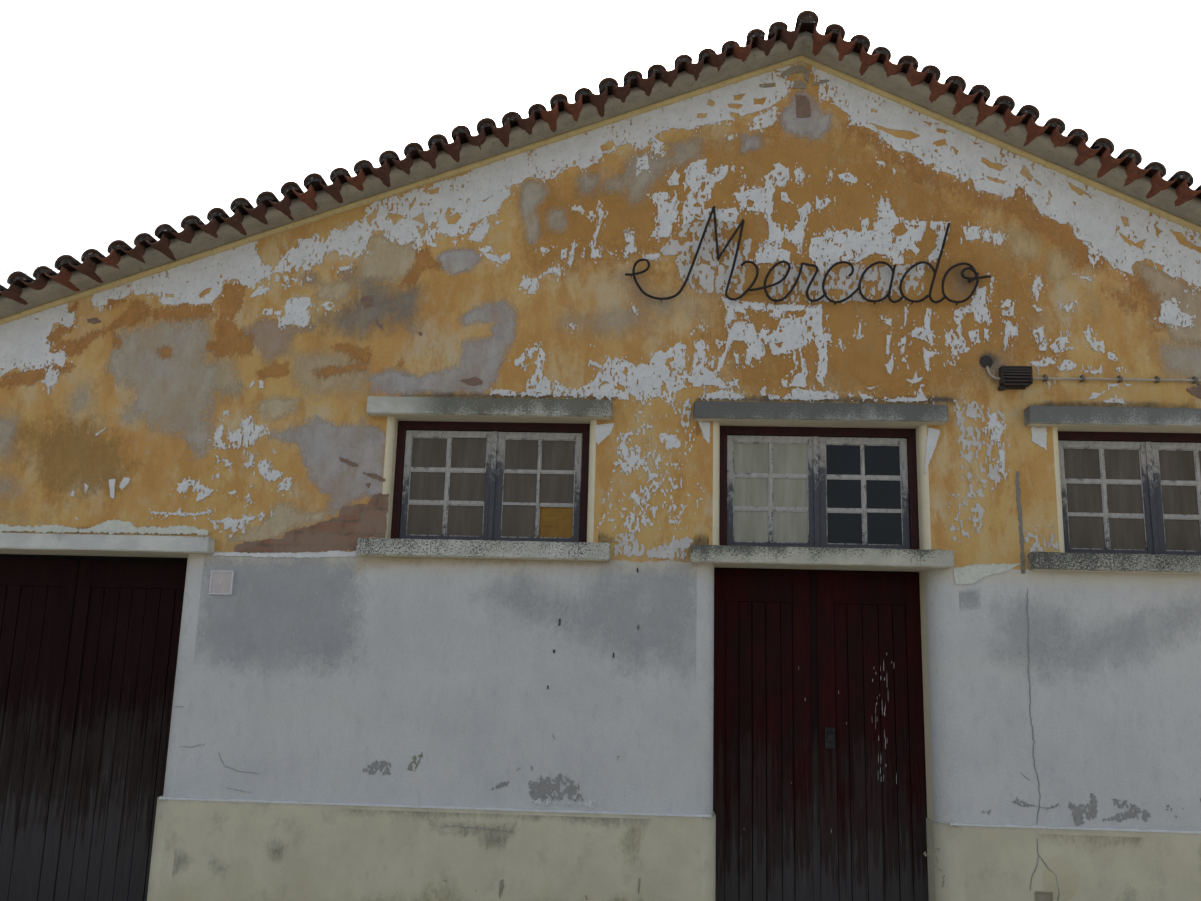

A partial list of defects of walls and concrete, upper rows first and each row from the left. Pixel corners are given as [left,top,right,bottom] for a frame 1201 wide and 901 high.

peeling [0,62,1201,561]
crack [1015,471,1060,901]
spalling [363,760,391,776]
spalling [491,766,584,802]
spalling [1012,793,1150,826]